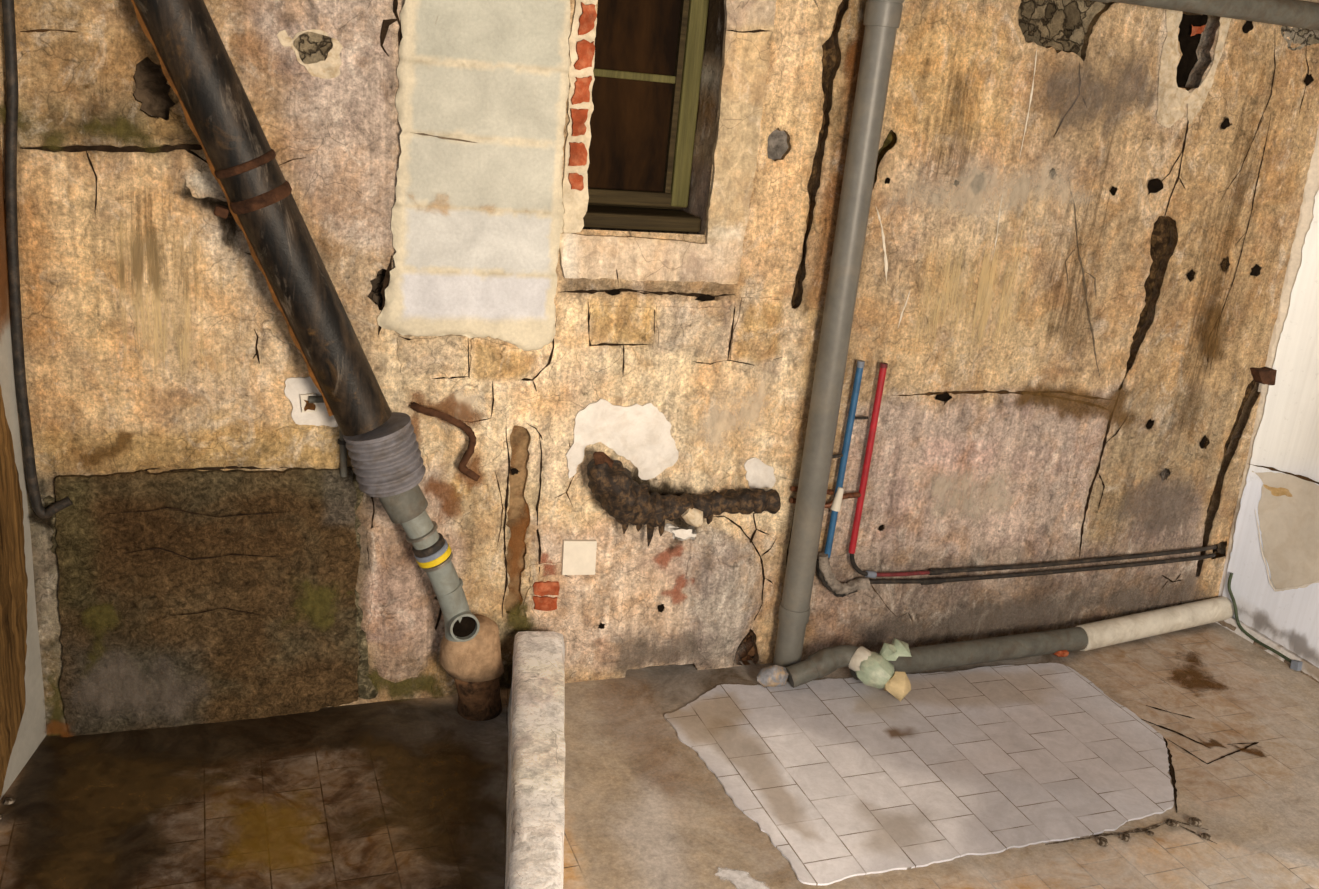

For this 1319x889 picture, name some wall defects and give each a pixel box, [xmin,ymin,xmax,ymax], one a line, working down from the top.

flaking render [133,57,175,120]
flaking render [1018,0,1111,57]
crack [20,144,208,218]
rust [411,395,479,440]
crack [897,182,1125,558]
peeling [1250,464,1319,592]
water stain [33,676,235,889]
water stain [357,739,508,889]